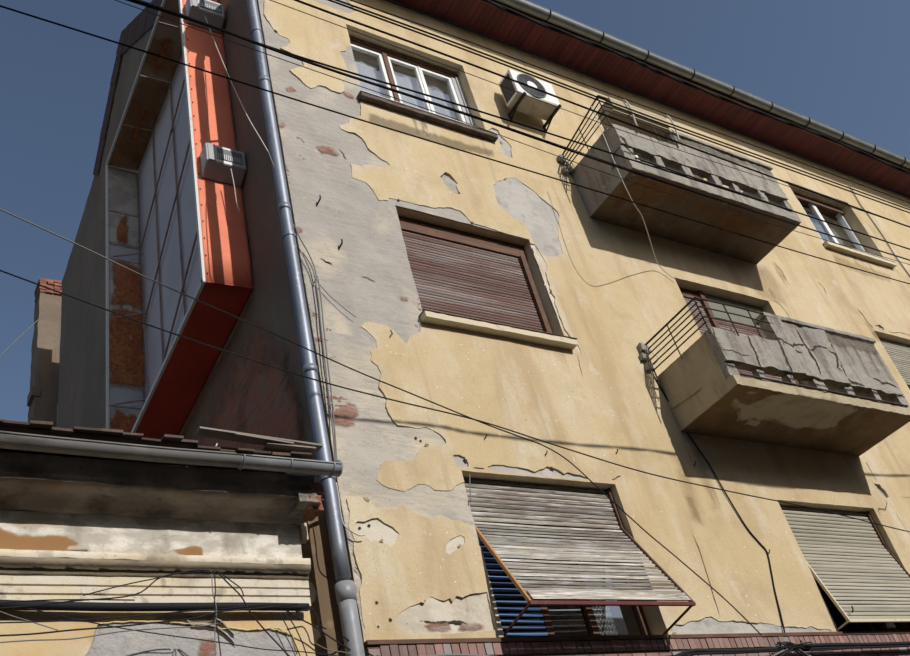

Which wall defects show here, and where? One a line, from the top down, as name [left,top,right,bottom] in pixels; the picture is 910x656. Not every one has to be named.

peeling [489,128,512,158]
peeling [258,0,501,634]
peeling [488,465,586,480]
peeling [0,528,90,551]
peeling [166,546,203,555]
peeling [671,617,831,635]